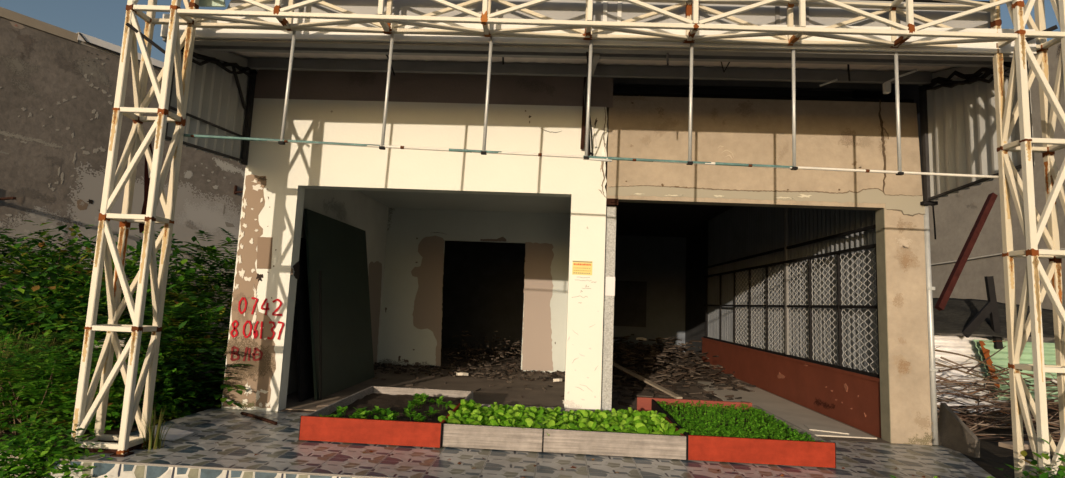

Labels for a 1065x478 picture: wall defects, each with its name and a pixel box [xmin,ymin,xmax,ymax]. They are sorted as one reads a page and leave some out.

rust [121,4,155,62]
rust [168,0,199,96]
rust [990,0,1049,121]
rust [109,108,120,151]
crack [598,99,925,217]
rust [997,139,1056,219]
rust [94,213,131,298]
rust [139,217,174,283]
flaking render [177,157,276,408]
flaking render [411,236,444,367]
flaking render [522,242,556,371]
rust [1002,248,1062,382]